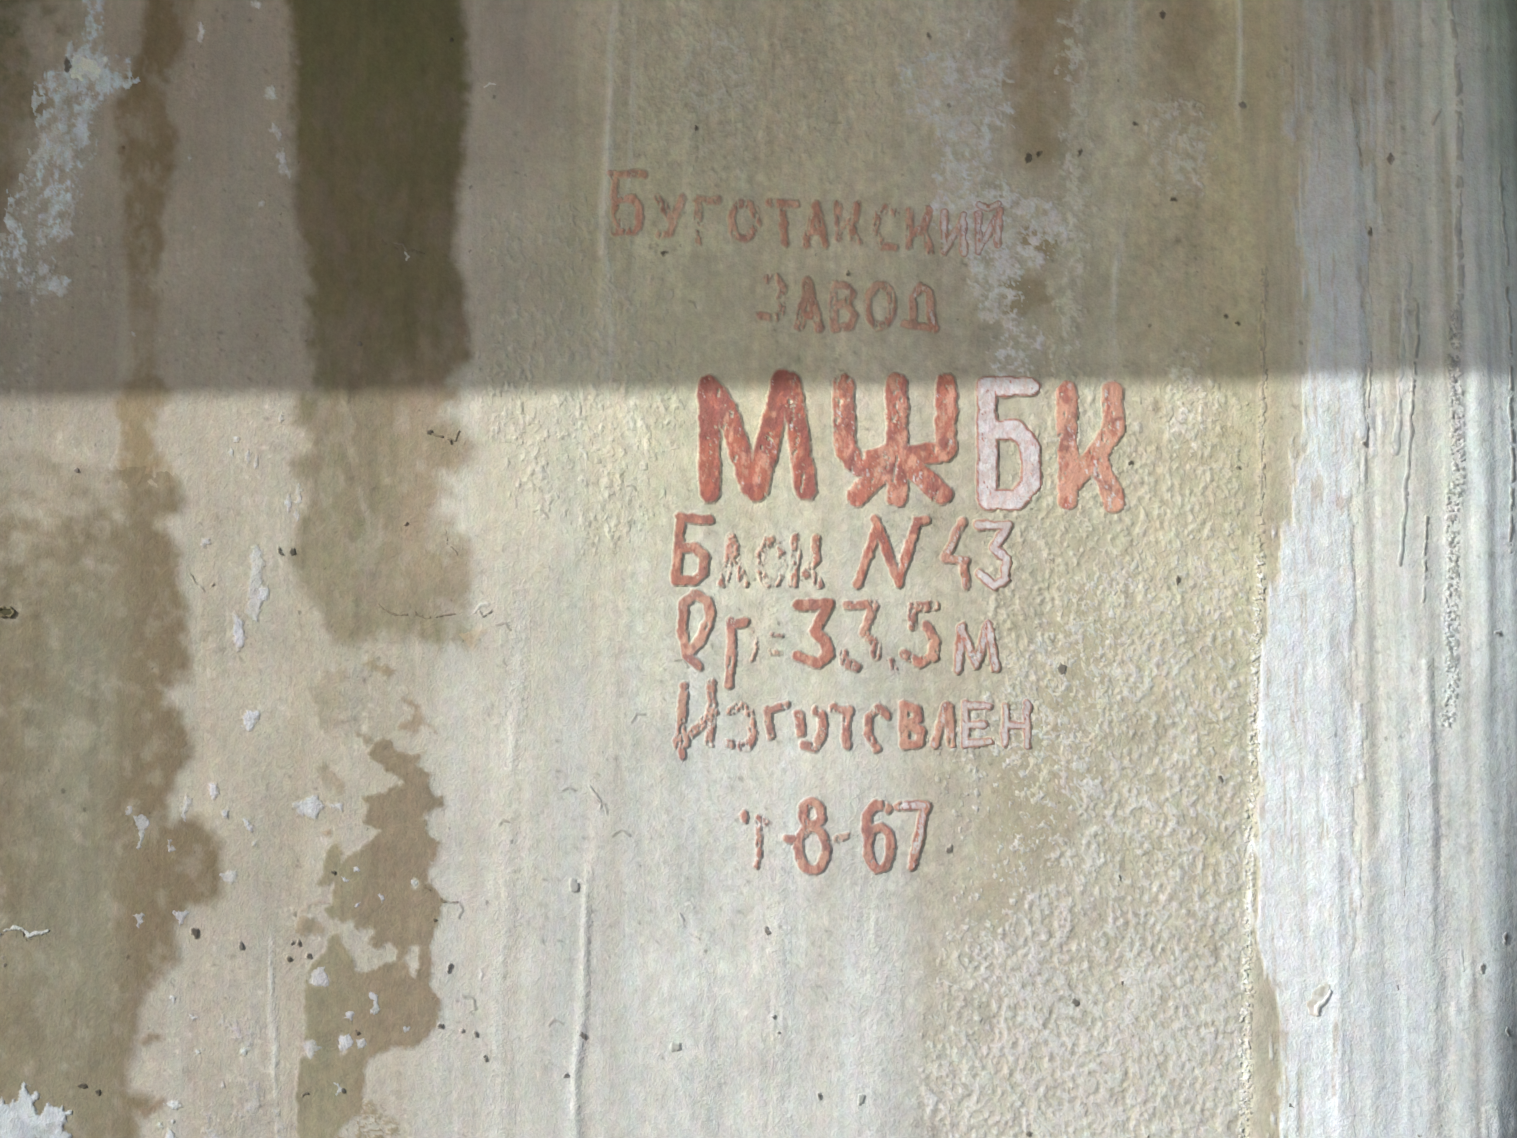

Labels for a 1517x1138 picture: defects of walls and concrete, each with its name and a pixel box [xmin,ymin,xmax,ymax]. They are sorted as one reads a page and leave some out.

damp [0,0,234,1138]
damp [267,0,1260,1138]
damp [1243,0,1482,1138]
crack [0,925,50,969]
peeling [0,1081,73,1138]
damp [199,695,449,1138]
damp [1459,1099,1517,1138]